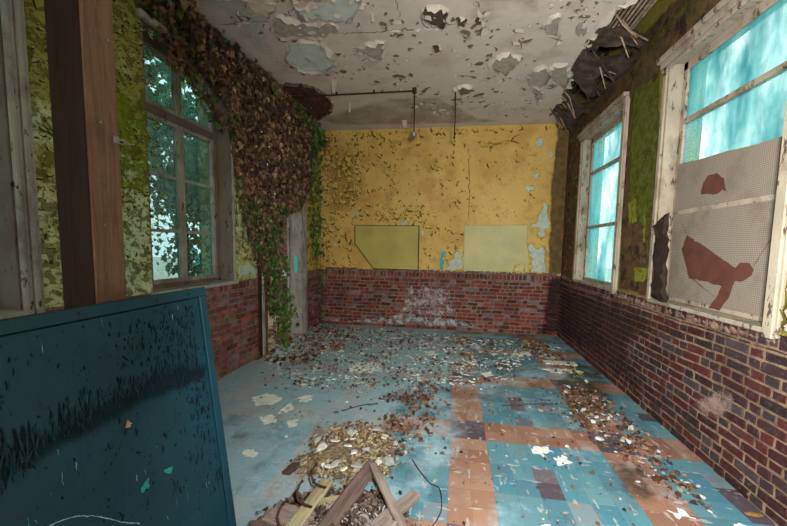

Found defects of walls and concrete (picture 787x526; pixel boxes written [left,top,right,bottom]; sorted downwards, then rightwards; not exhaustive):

peeling [112,0,159,102]
crack [332,0,485,35]
peeling [34,116,57,204]
peeling [119,116,166,271]
damp [349,285,474,327]